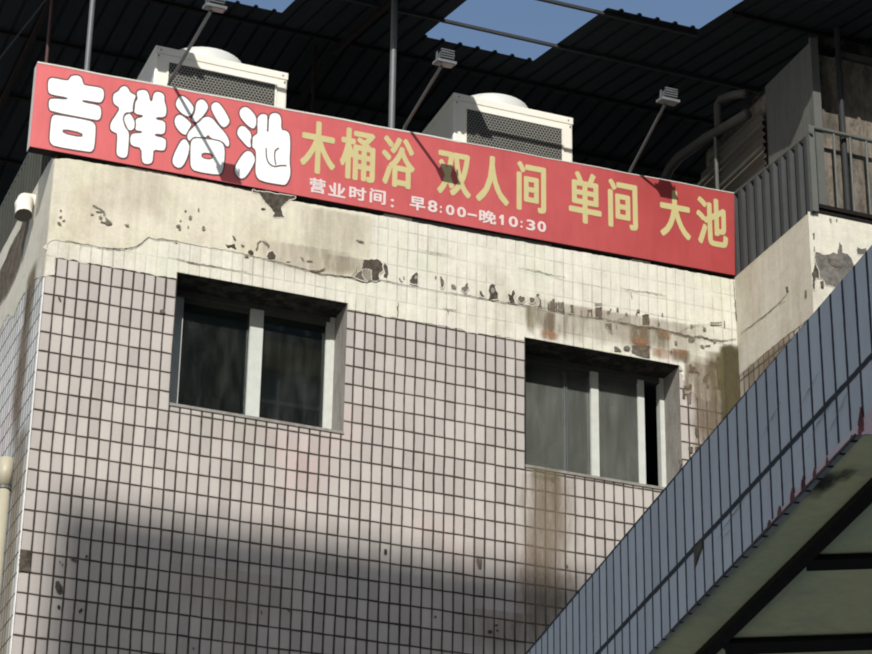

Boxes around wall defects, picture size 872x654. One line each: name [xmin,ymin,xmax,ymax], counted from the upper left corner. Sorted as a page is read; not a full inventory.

peeling [90,205,112,225]
spalling [0,220,30,305]
spalling [226,235,290,263]
spalling [354,258,388,282]
spalling [399,272,419,286]
crack [68,236,787,341]
spalling [435,275,663,334]
spalling [805,233,867,298]